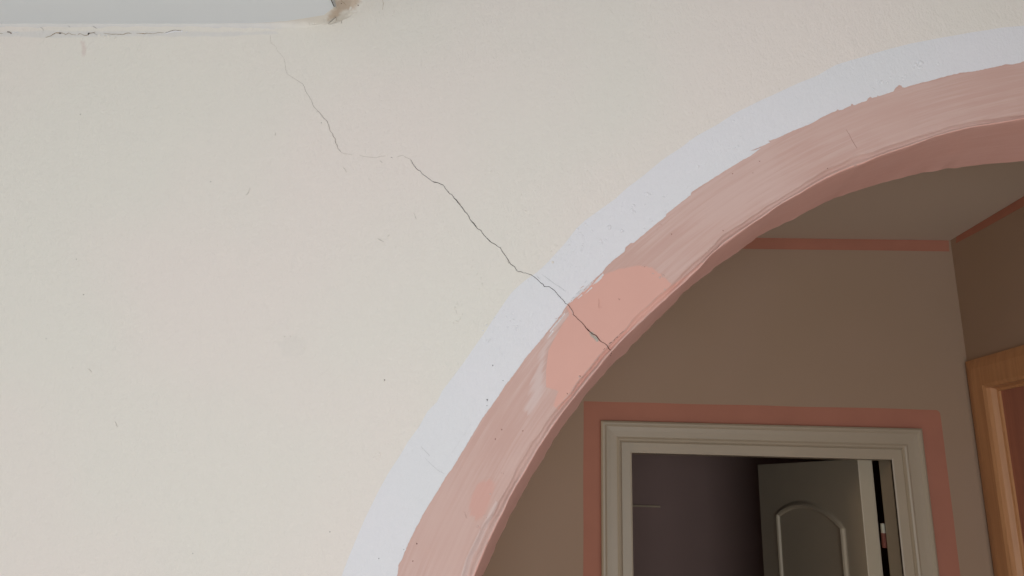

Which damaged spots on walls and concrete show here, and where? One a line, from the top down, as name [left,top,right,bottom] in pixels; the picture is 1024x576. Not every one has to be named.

crack [270,38,617,356]